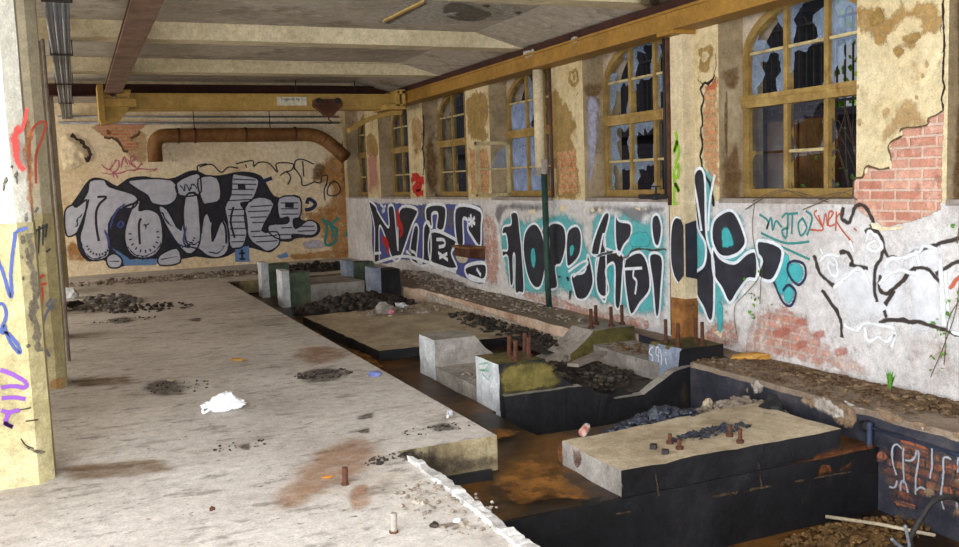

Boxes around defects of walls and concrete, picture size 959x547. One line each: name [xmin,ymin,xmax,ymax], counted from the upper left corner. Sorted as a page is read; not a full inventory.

water stain [856,3,942,58]
crack [939,0,947,111]
spalling [93,124,146,153]
rust [291,156,348,259]
peeling [552,89,580,212]
crack [698,55,716,207]
spalling [703,76,720,185]
spalling [852,110,944,231]
rust [306,347,388,373]
spalling [704,306,865,377]
rust [497,455,584,502]